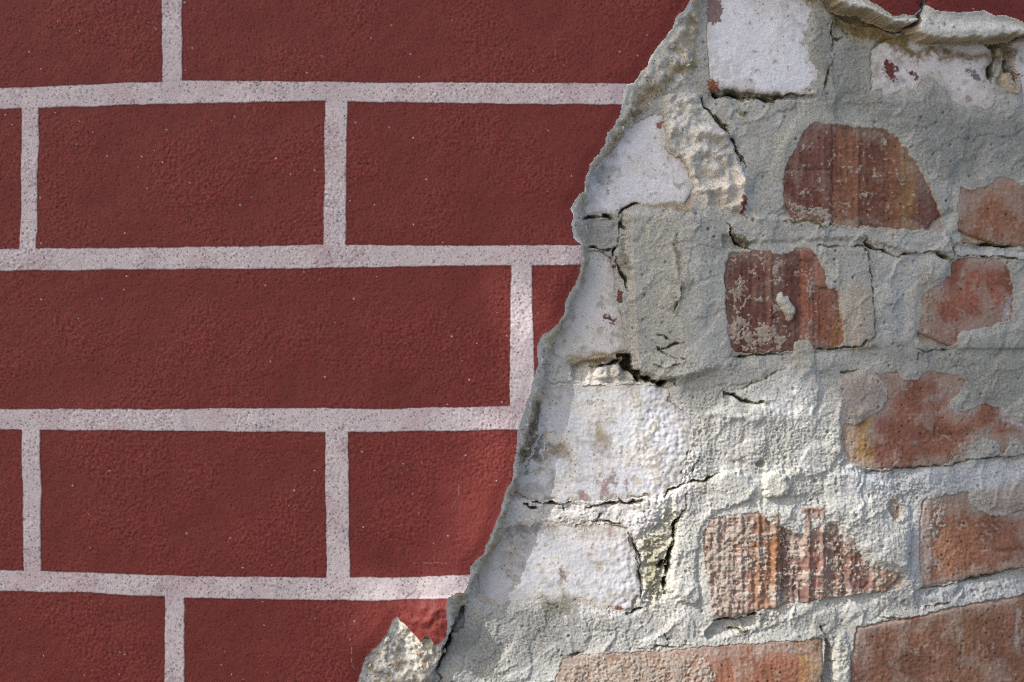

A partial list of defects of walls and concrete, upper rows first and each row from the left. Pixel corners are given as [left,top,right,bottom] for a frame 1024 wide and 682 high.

crack [700,18,845,167]
crack [582,202,640,296]
crack [588,284,686,387]
peeling [358,0,1024,682]
crack [523,456,721,616]